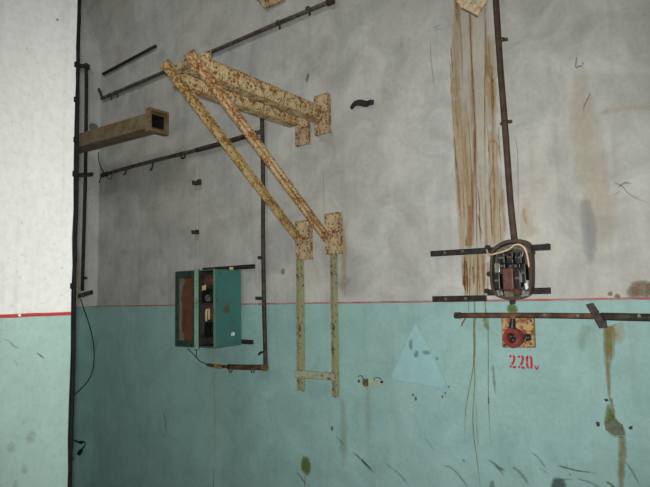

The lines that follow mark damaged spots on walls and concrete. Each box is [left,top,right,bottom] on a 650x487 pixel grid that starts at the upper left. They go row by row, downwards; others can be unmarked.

rust [464,254,484,295]
leakage [629,282,650,297]